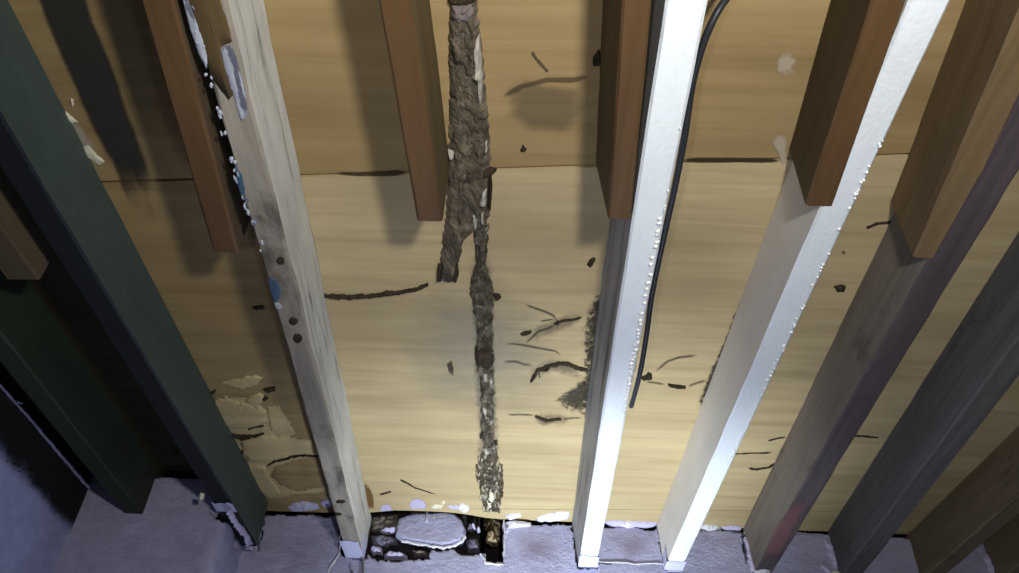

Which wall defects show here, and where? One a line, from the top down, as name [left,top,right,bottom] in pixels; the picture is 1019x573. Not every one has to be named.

water stain [460,318,478,365]
water stain [492,345,502,361]
water stain [555,295,600,417]
peeling [210,375,333,512]
spalling [365,501,570,566]